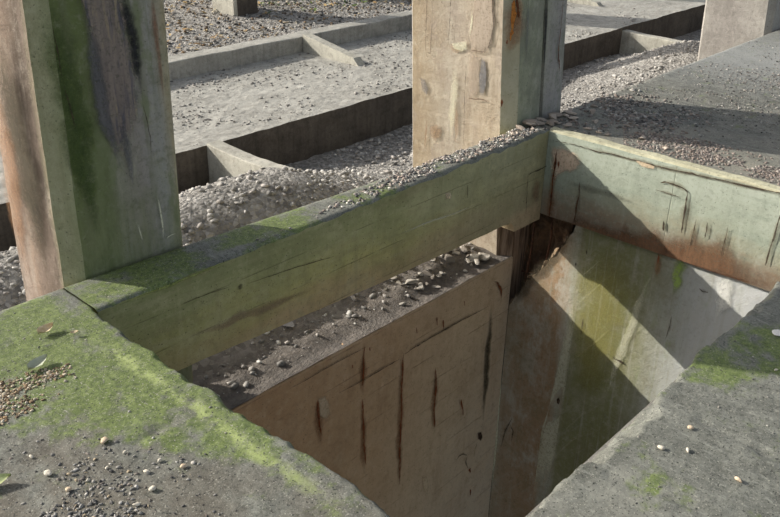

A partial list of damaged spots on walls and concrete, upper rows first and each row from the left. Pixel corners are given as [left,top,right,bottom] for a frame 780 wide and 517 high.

water stain [121,2,141,79]
corrosion [506,0,520,44]
crack [556,141,780,256]
crack [765,216,780,266]
water stain [484,323,492,403]